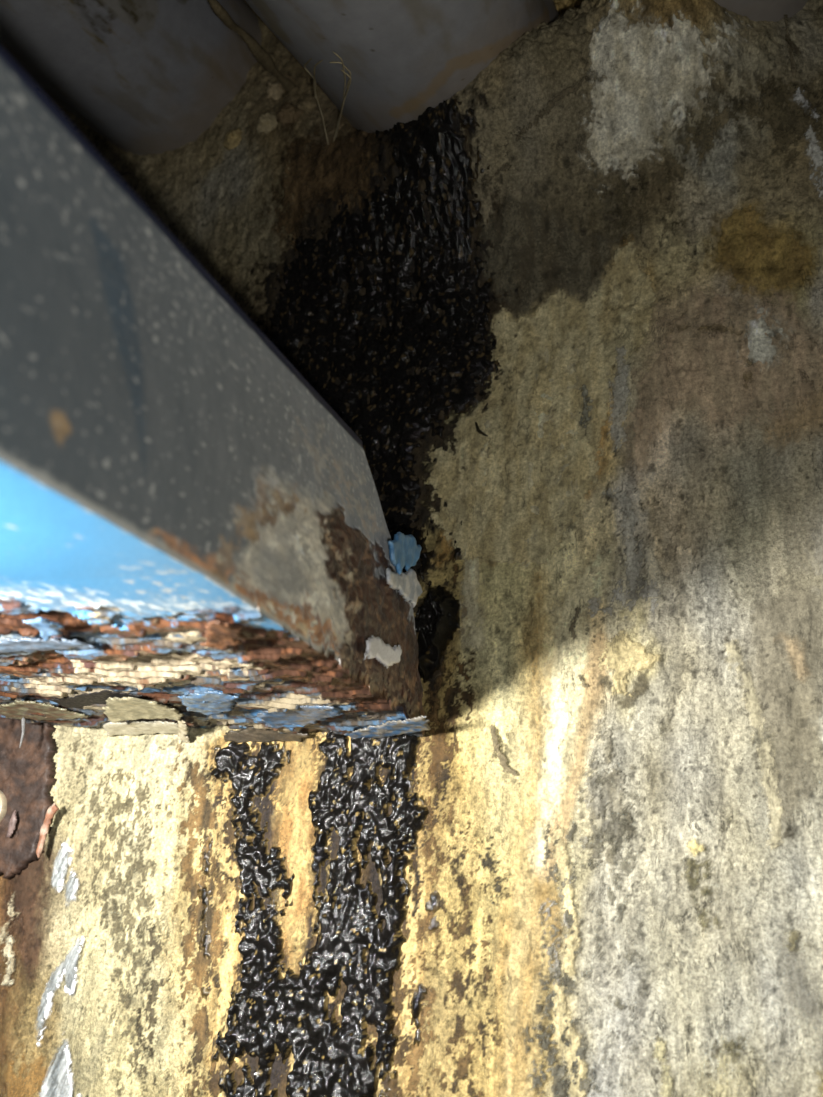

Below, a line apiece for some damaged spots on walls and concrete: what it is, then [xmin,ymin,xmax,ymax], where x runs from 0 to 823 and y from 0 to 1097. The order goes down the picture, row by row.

peeling [386,532,423,608]
damp [174,73,823,1097]
peeling [0,617,96,654]
peeling [200,620,244,650]
peeling [363,635,402,668]
peeling [0,690,240,743]
peeling [224,705,344,743]
peeling [344,715,431,739]
damp [69,739,175,1083]
corrosion [0,803,59,1097]